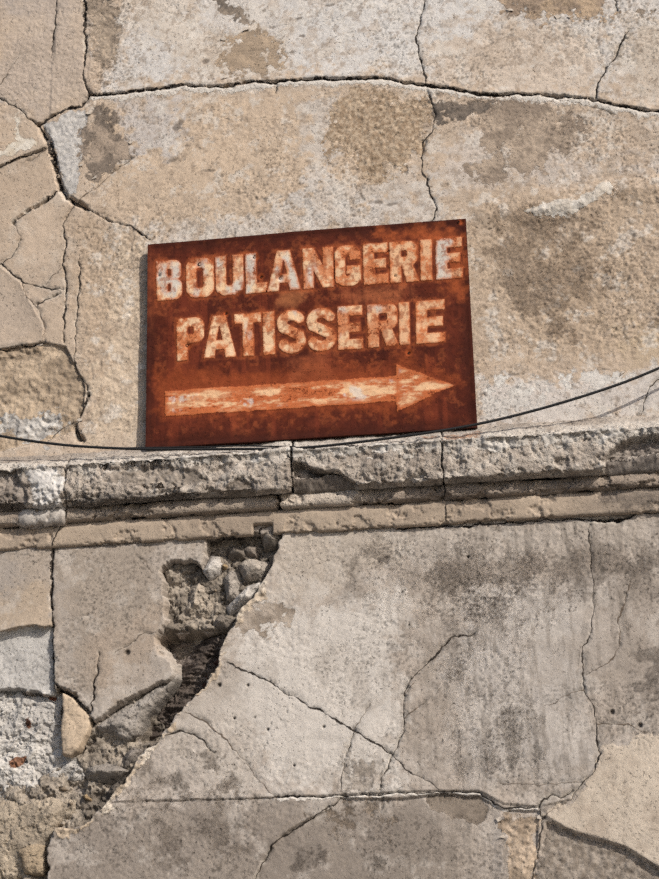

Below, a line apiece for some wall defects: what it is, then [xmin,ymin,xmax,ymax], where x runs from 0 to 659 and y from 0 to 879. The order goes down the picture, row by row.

crack [0,0,659,442]
spalling [0,532,295,879]
crack [106,443,652,879]